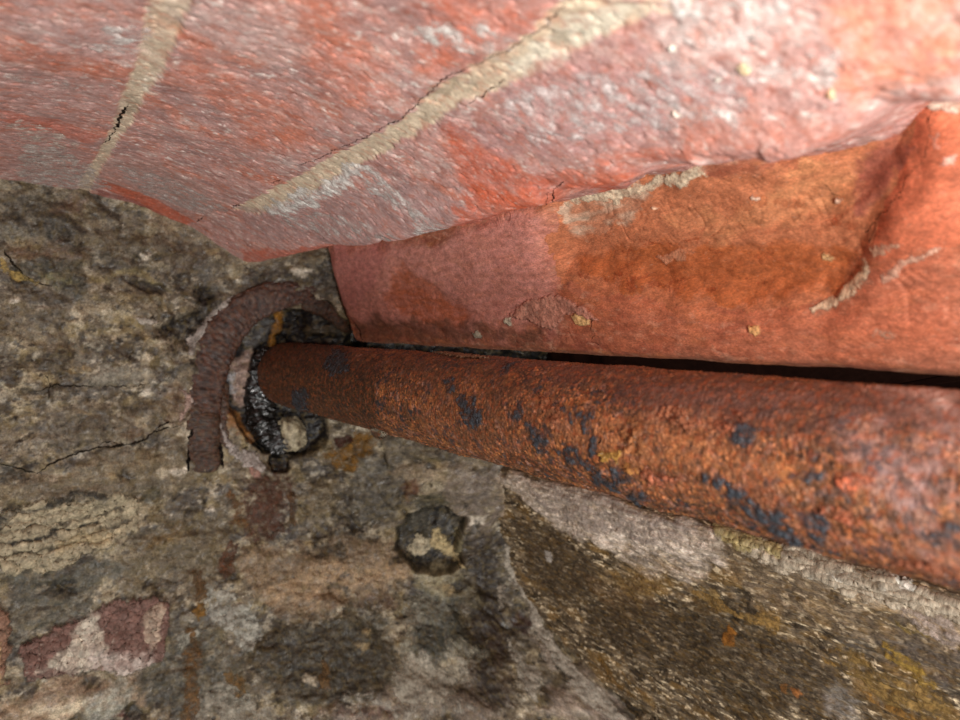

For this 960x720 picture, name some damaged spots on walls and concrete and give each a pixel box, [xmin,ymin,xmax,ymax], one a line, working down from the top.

crack [105,106,128,143]
spalling [510,104,960,329]
crack [1,421,194,474]
rust [323,432,373,472]
rust [227,467,296,545]